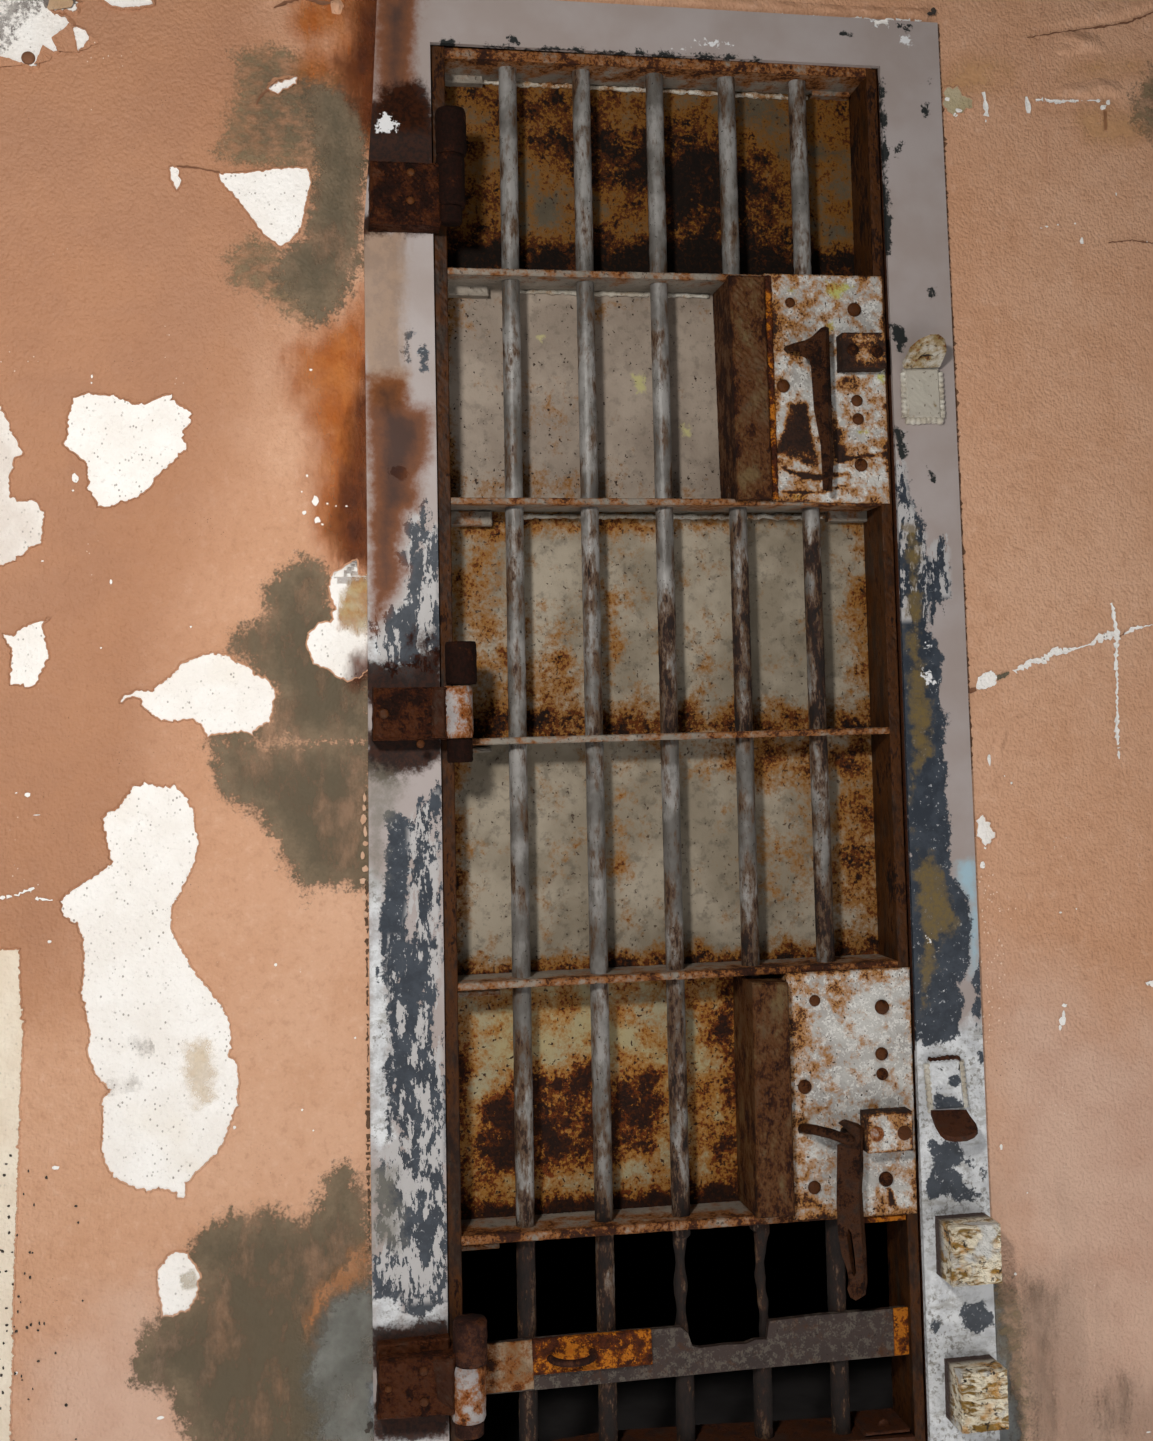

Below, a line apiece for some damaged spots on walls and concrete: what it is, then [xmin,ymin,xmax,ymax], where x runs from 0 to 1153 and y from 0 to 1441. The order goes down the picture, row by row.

peeling [0,0,156,71]
peeling [217,165,312,248]
leakage [208,47,368,329]
rust [297,0,377,137]
peeling [0,404,46,567]
peeling [61,375,193,509]
rust [299,316,367,562]
crack [855,16,1152,770]
peeling [118,651,276,739]
leakage [203,552,369,897]
peeling [58,780,241,1199]
leakage [128,1158,374,1441]